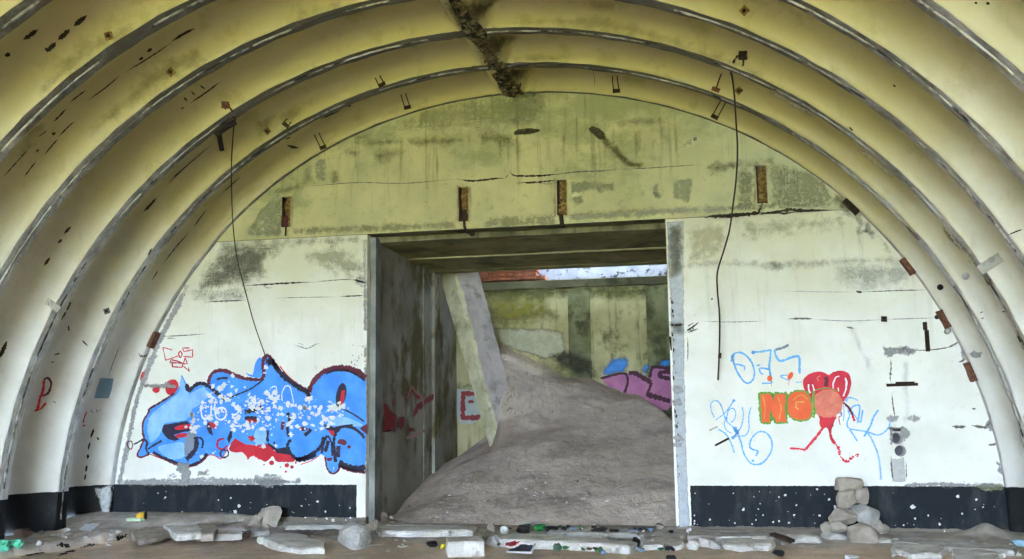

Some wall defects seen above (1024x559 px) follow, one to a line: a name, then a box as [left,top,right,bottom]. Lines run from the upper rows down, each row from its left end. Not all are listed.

crack [305,164,703,187]
crack [700,203,828,219]
leakage [201,245,272,288]